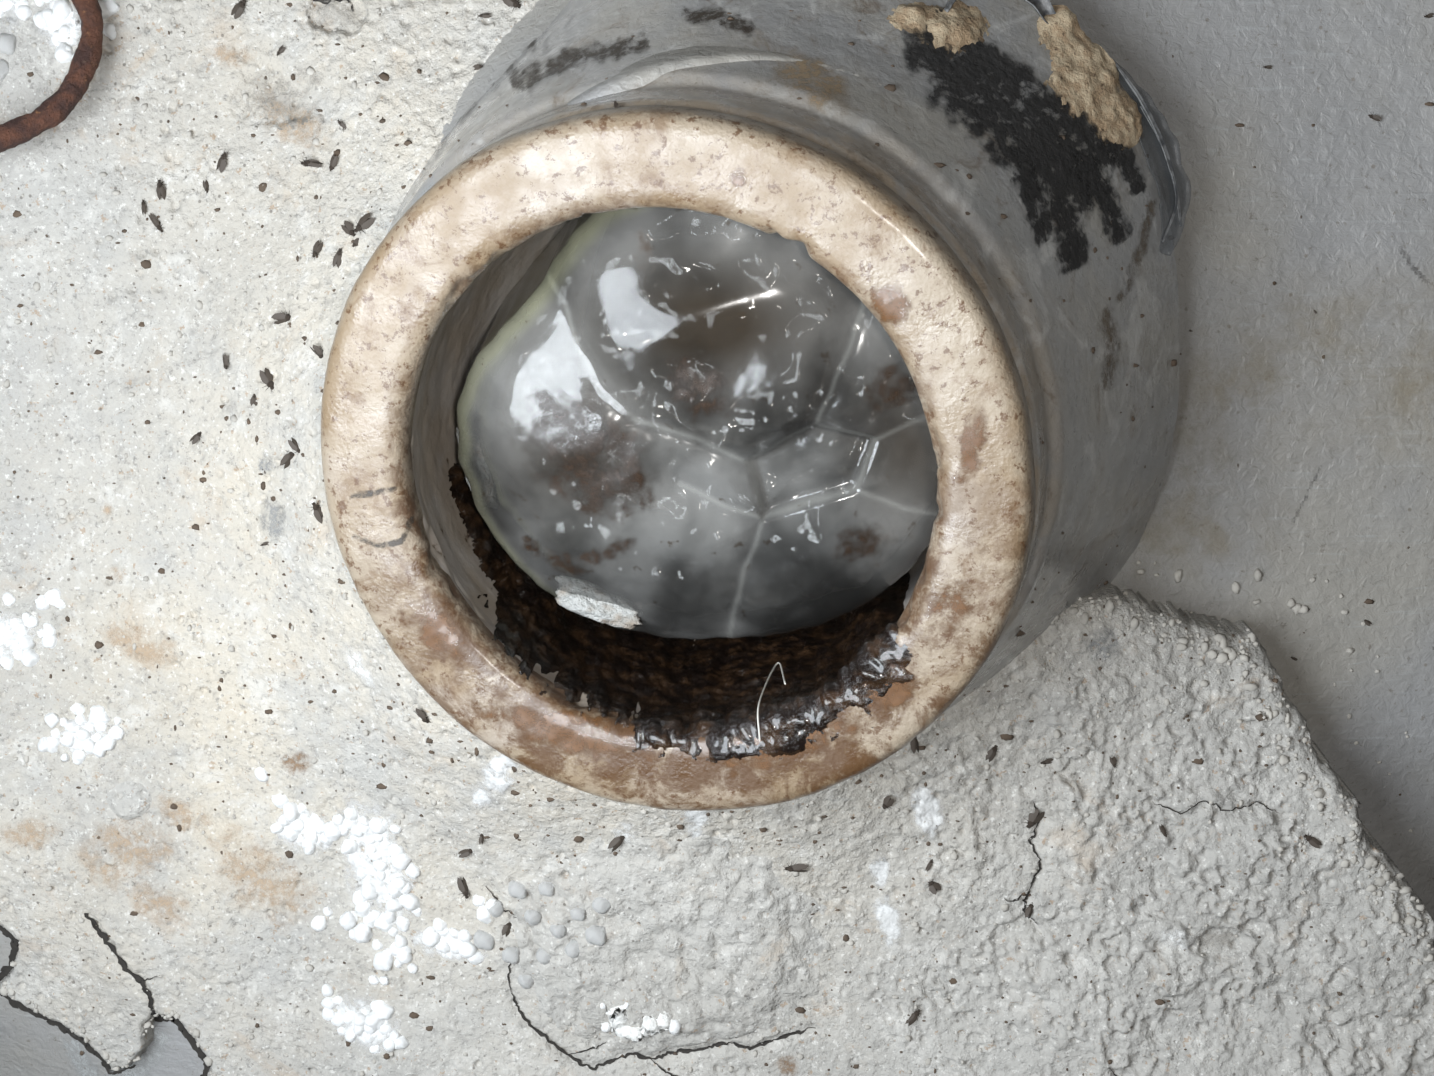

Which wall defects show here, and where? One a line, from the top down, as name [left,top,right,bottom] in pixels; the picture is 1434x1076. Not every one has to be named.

efflorescence [41,0,81,46]
water stain [1017,161,1052,247]
water stain [1071,139,1146,245]
rust [416,590,467,658]
rust [864,667,913,709]
rust [482,701,655,762]
rust [725,720,858,777]
efflorescence [346,802,461,959]
crack [507,963,814,1076]